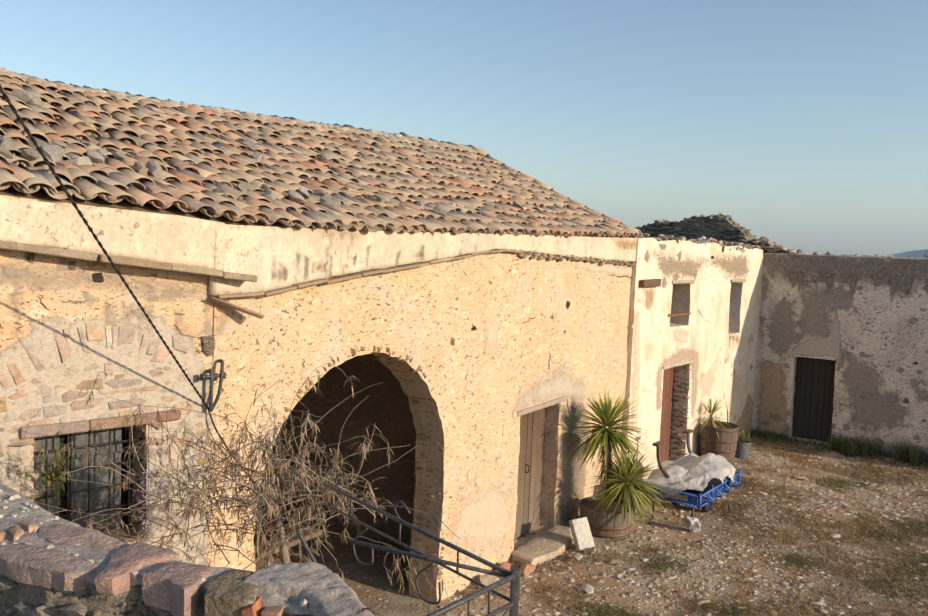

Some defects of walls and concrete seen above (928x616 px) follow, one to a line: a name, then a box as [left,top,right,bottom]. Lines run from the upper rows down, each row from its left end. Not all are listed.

flaking render [0,312,217,565]
flaking render [721,273,858,434]
flaking render [837,346,928,431]